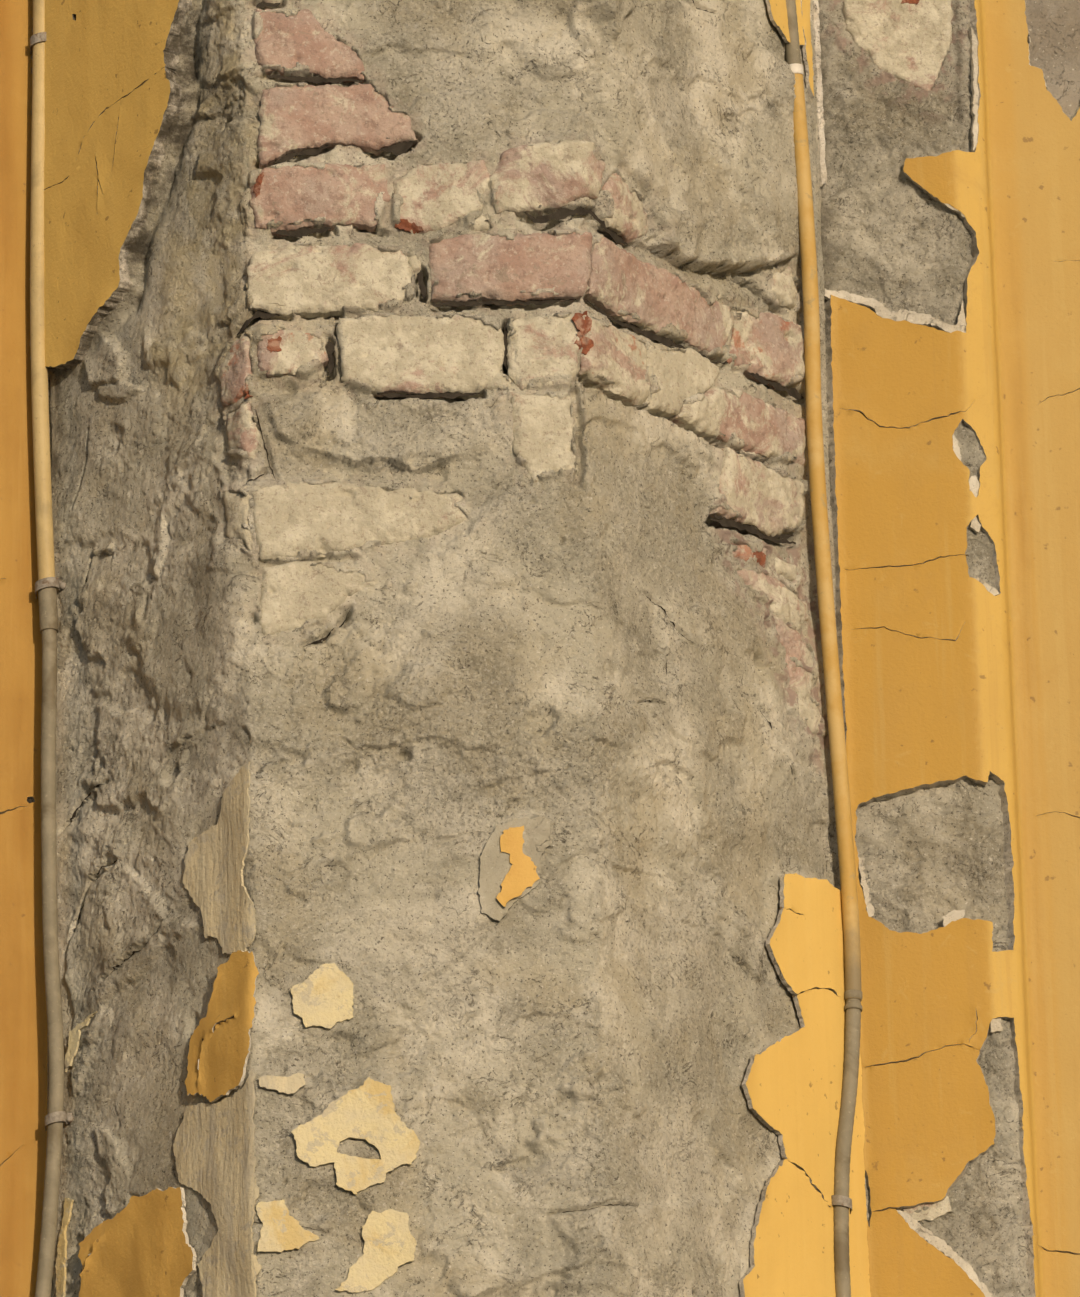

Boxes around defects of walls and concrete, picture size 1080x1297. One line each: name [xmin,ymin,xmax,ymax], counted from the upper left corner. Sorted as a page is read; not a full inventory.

spalling [1025,0,1080,121]
spalling [766,0,979,418]
flaking render [218,0,822,735]
crack [854,410,959,429]
spalling [855,777,1010,952]
peeling [185,950,305,1102]
peeling [290,963,354,1029]
peeling [291,1077,420,1195]
spalling [897,1018,1030,1297]
peeling [55,1187,197,1297]
peeling [256,1200,320,1253]
peeling [335,1209,417,1293]